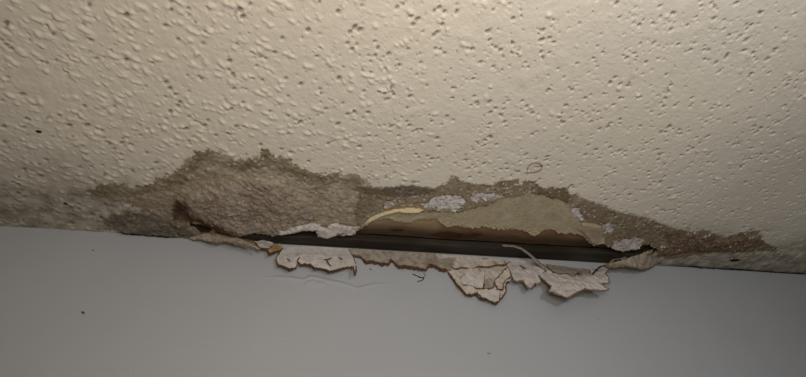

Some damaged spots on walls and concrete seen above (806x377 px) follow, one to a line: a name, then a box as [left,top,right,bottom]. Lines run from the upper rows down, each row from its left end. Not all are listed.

peeling [188,193,661,305]
damp [86,148,777,259]